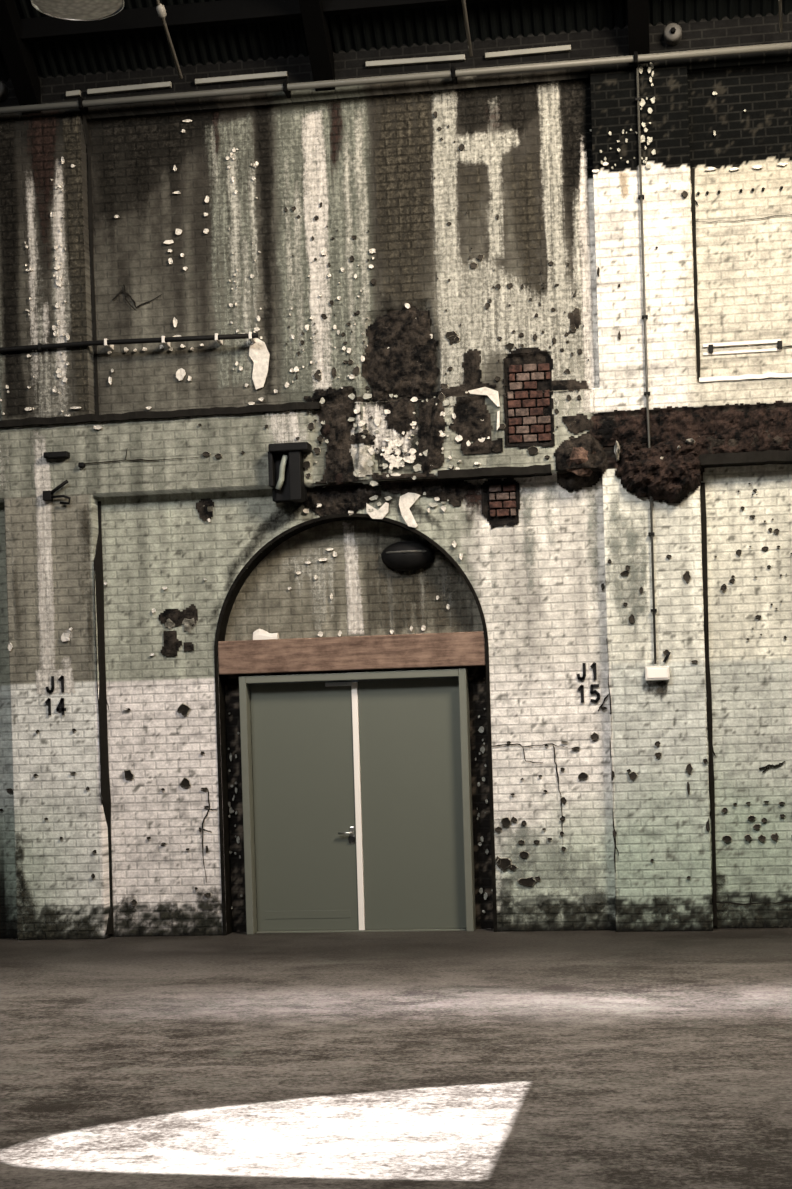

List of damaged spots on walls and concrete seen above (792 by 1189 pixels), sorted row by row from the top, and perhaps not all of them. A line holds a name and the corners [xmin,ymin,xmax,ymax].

peeling [592,62,656,173]
leakage [0,83,595,454]
peeling [736,483,792,555]
spalling [150,604,198,657]
peeling [686,759,708,794]
peeling [721,801,792,843]
leakage [0,833,101,940]
leakage [115,888,222,935]
leakage [497,828,792,931]